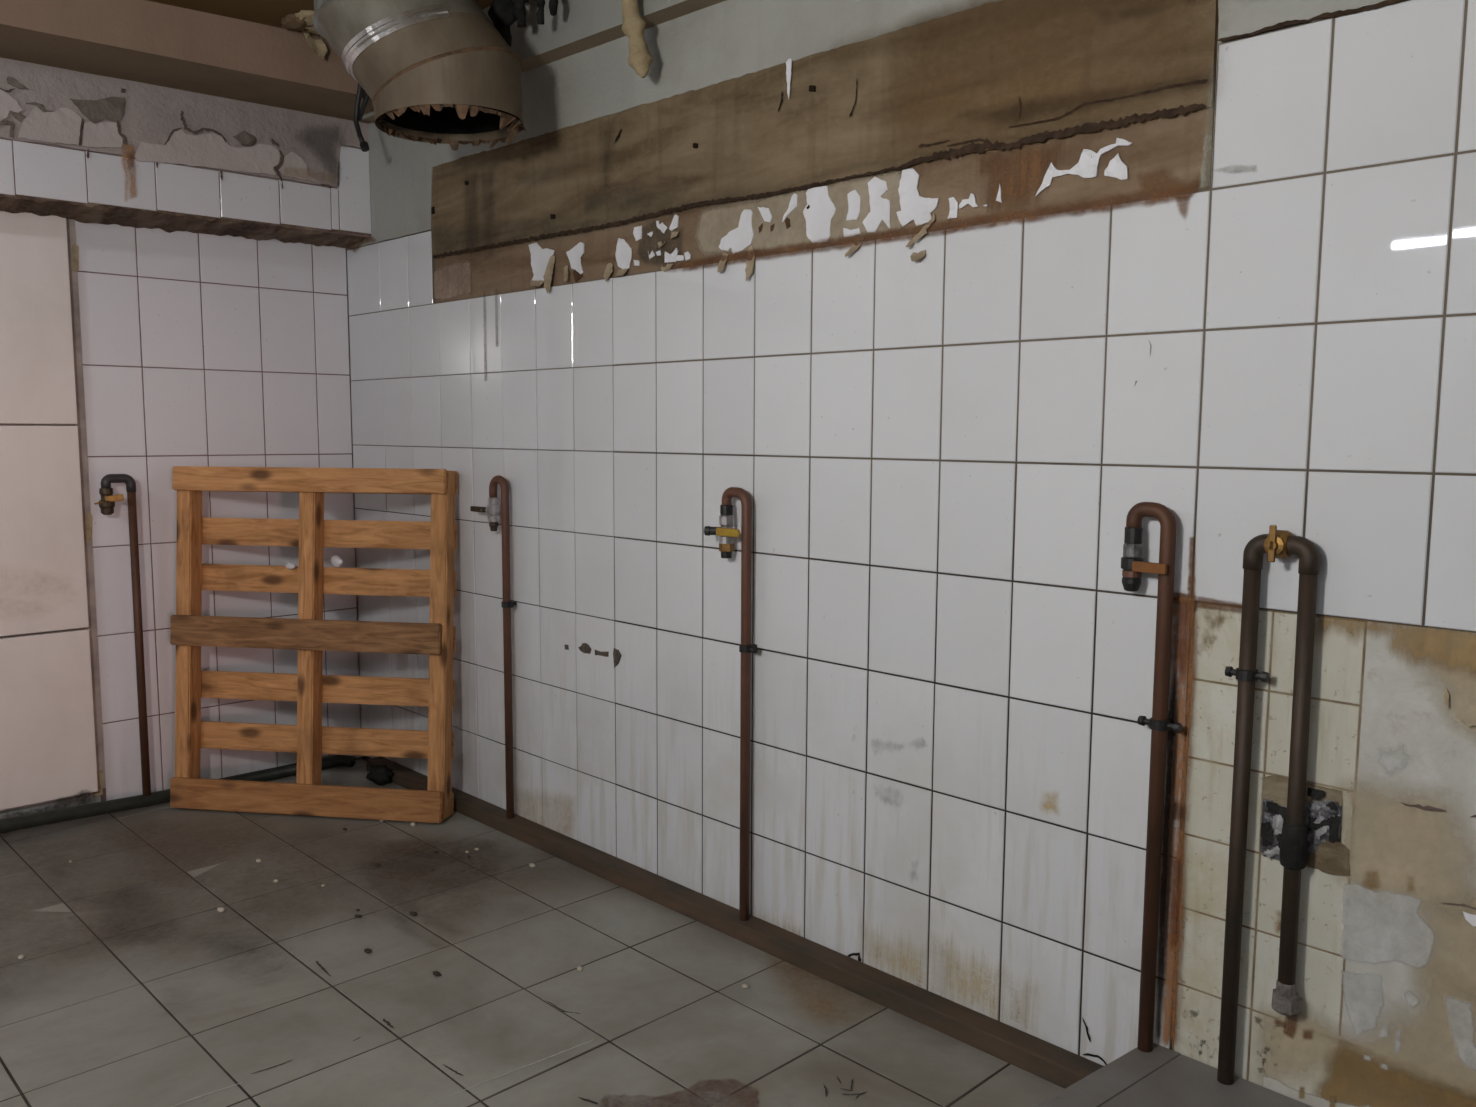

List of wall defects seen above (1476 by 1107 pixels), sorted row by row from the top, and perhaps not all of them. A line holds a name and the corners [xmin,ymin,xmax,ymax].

flaking render [0,76,320,183]
corrosion [1157,538,1241,1044]
peeling [1260,775,1434,1069]
flaking render [1443,907,1476,926]
peeling [1446,997,1476,1070]